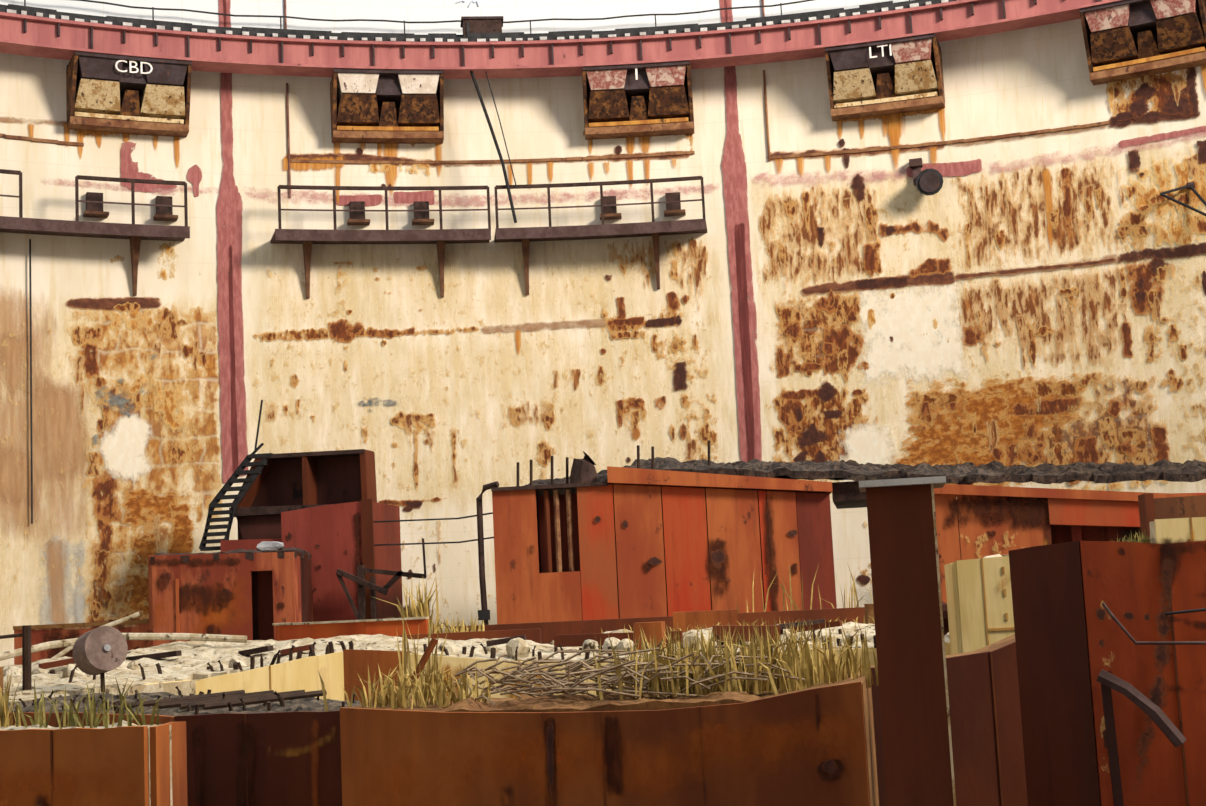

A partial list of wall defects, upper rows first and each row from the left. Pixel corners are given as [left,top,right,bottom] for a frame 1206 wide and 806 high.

leakage [0,297,151,624]
rust [36,297,240,659]
rust [158,243,176,280]
rust [254,238,717,480]
rust [283,131,693,203]
rust [759,65,1206,467]
rust [1058,480,1168,491]